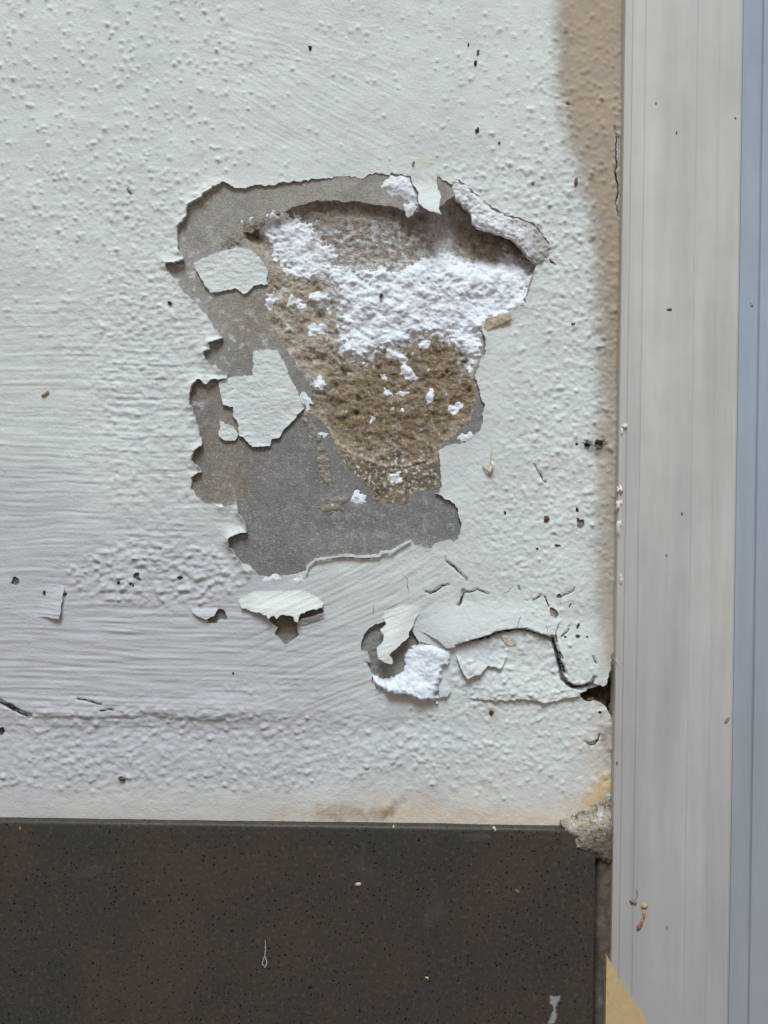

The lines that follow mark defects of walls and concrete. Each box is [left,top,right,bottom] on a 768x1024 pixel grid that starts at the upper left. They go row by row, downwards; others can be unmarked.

damp [557,0,622,411]
spalling [166,162,552,644]
peeling [361,605,516,704]
crack [373,558,596,688]
spalling [580,670,612,715]
spalling [560,793,613,863]